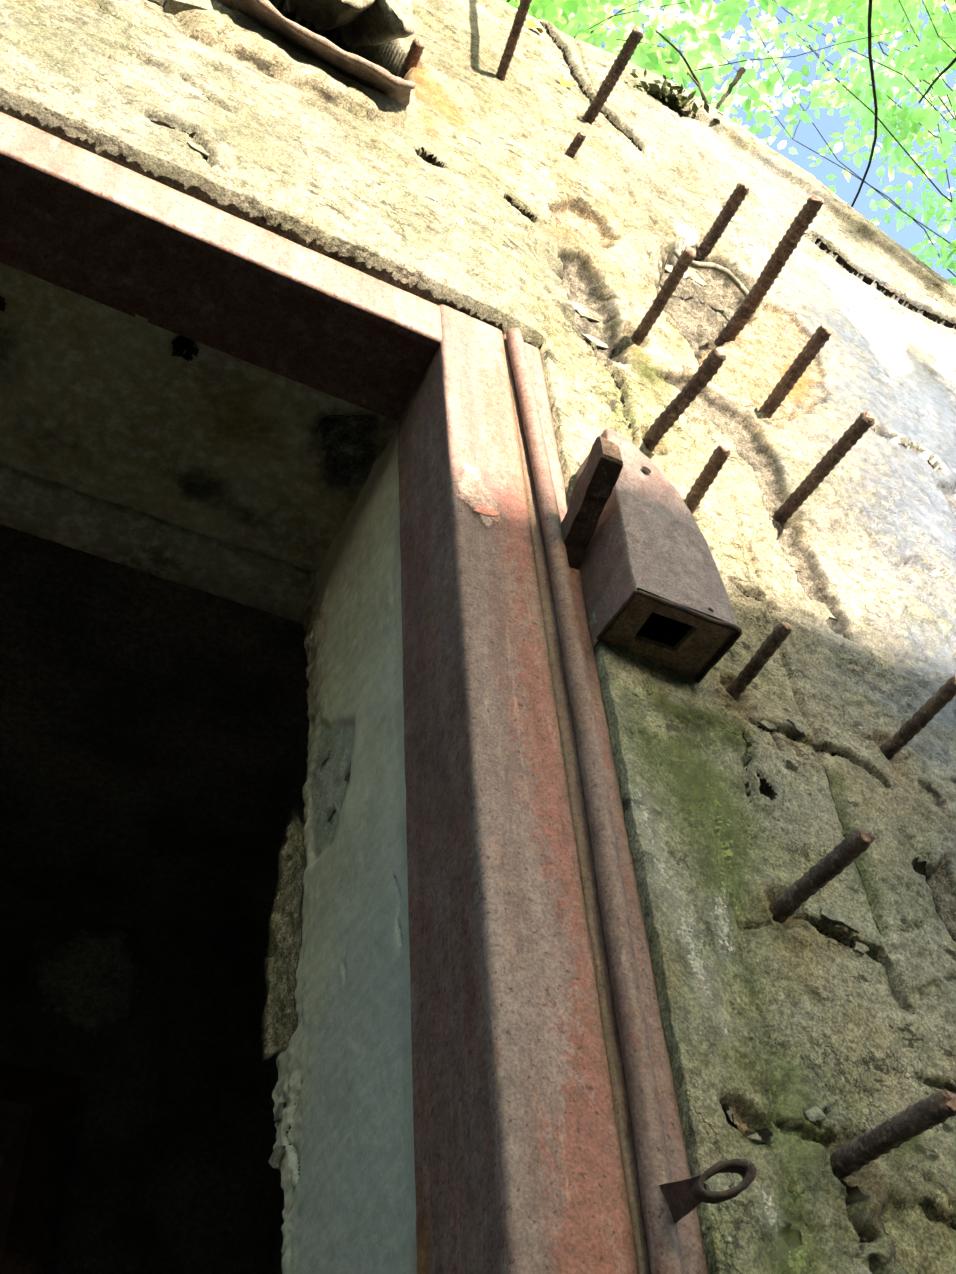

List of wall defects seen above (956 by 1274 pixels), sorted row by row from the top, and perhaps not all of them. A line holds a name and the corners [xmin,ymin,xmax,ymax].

crack [540,22,644,153]
crack [133,110,228,167]
crack [805,233,956,330]
spalling [549,182,875,639]
peeling [458,463,503,528]
crack [743,718,871,803]
spalling [263,727,353,1057]
efflorescence [678,916,713,998]
efflorescence [714,898,731,952]
crack [816,906,891,983]
spalling [721,1101,773,1144]
crack [803,1106,831,1145]